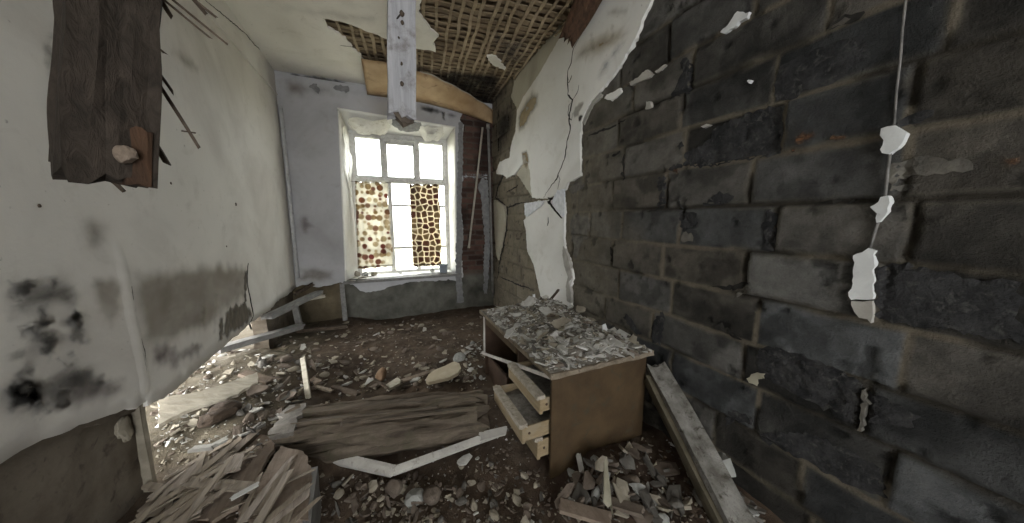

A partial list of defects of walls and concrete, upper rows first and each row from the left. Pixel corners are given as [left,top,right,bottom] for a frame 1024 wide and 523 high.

crack [495,34,582,289]
flaking render [478,0,654,306]
spalling [668,33,869,171]
spalling [898,110,934,127]
spalling [889,155,973,192]
spalling [760,209,779,251]
water stain [197,268,252,340]
spalling [874,262,1024,345]
water stain [12,388,30,407]
water stain [48,372,92,403]
spalling [746,346,921,428]
spalling [760,431,888,498]